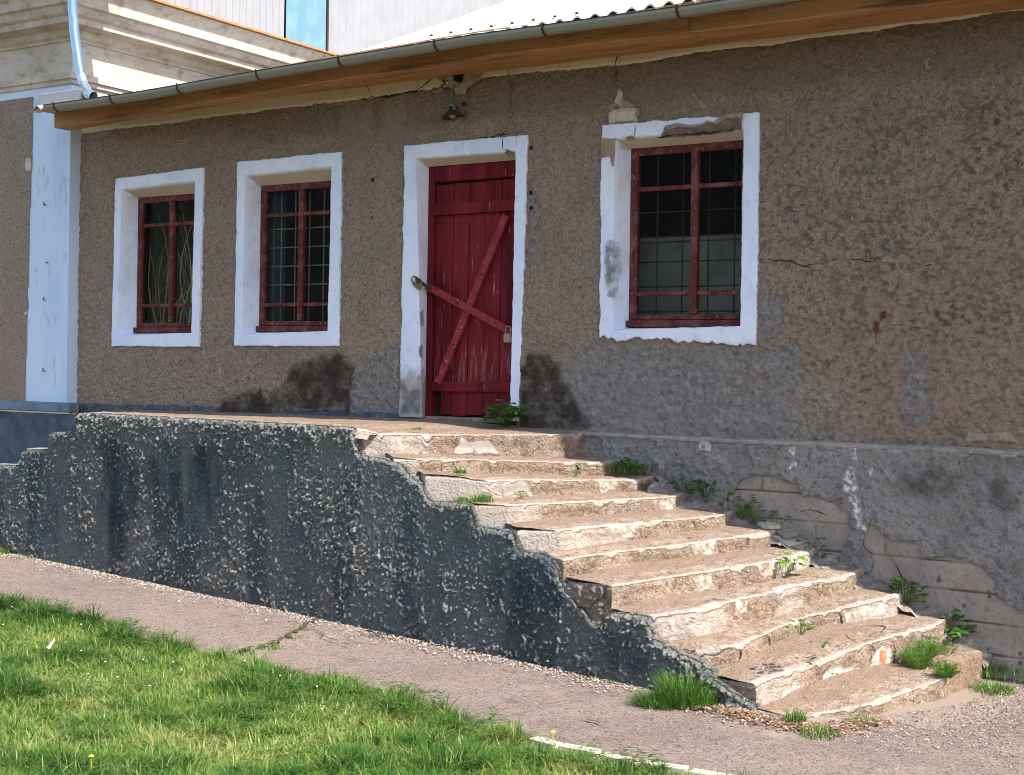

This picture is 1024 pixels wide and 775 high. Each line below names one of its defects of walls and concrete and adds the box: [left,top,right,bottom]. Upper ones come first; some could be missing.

peeling [608,89,640,123]
flaking render [657,93,743,138]
peeling [600,136,635,166]
peeling [605,243,622,297]
crack [763,257,817,270]
leakage [219,348,420,413]
leakage [520,295,801,436]
flaking render [720,475,851,562]
leakage [844,468,867,531]
peeling [758,558,805,575]
peeling [844,603,885,623]
flaking render [864,519,1024,681]